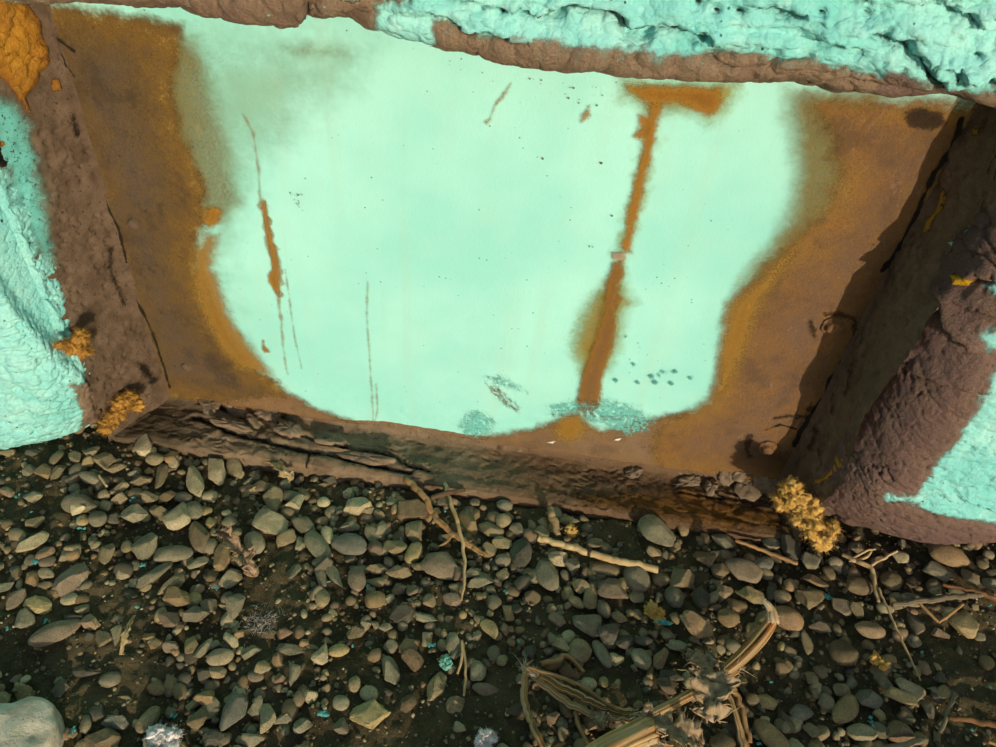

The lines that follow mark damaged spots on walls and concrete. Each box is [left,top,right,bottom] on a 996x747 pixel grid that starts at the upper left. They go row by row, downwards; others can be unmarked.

spalling [904,107,946,132]
corrosion [50,3,359,424]
corrosion [462,81,977,481]
crack [880,117,965,273]
peeling [197,399,397,466]
peeling [732,470,779,498]
crack [744,311,859,458]